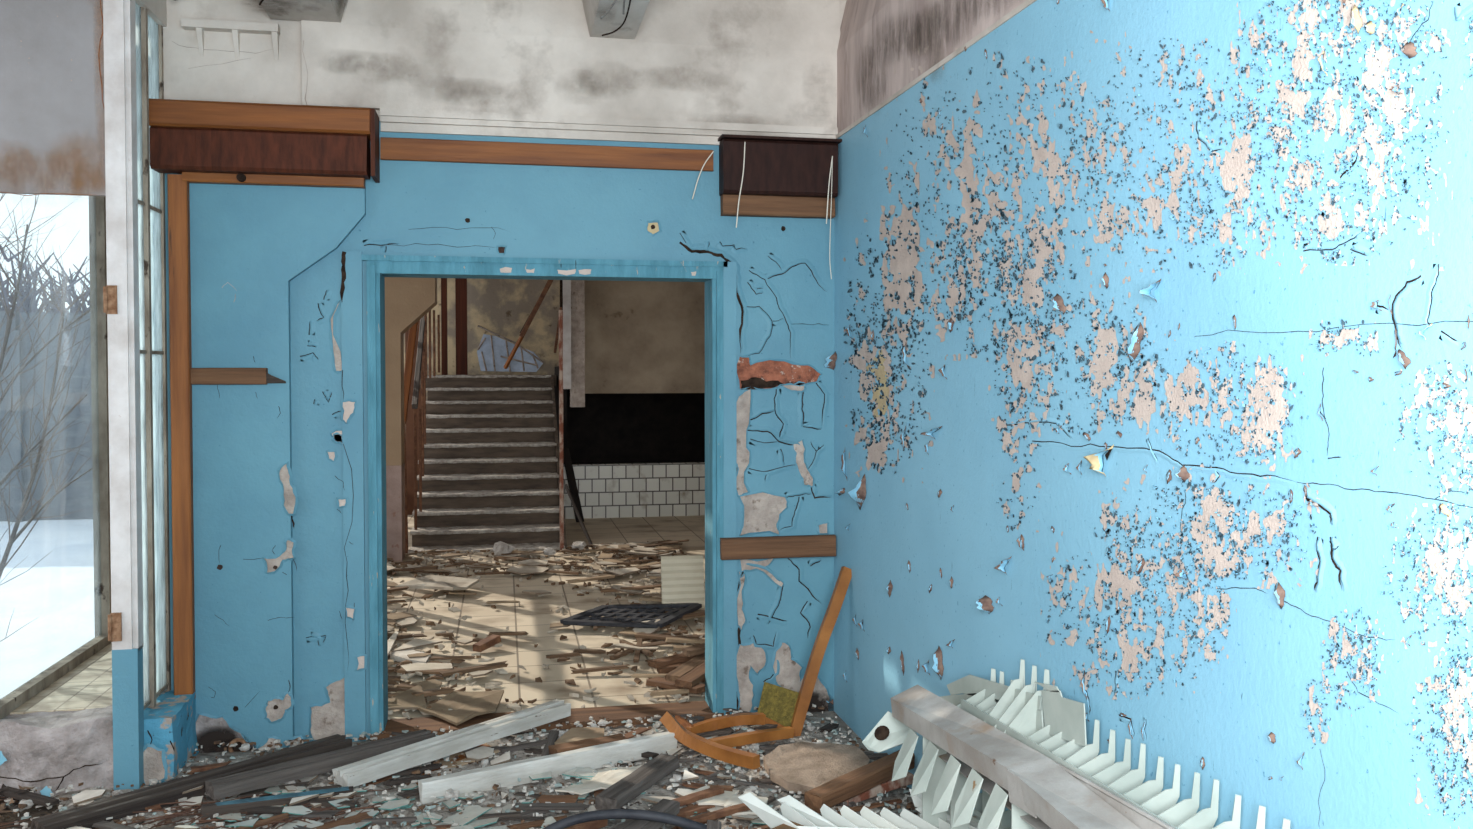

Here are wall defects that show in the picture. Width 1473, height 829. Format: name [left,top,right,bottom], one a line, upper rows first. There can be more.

flaking render [329,299,342,374]
crack [1195,264,1473,350]
flaking render [277,461,299,517]
flaking render [325,398,357,462]
crack [679,232,832,683]
peeling [736,0,1473,829]
crack [1006,368,1473,640]
flaking render [262,537,297,575]
flaking render [196,654,367,749]